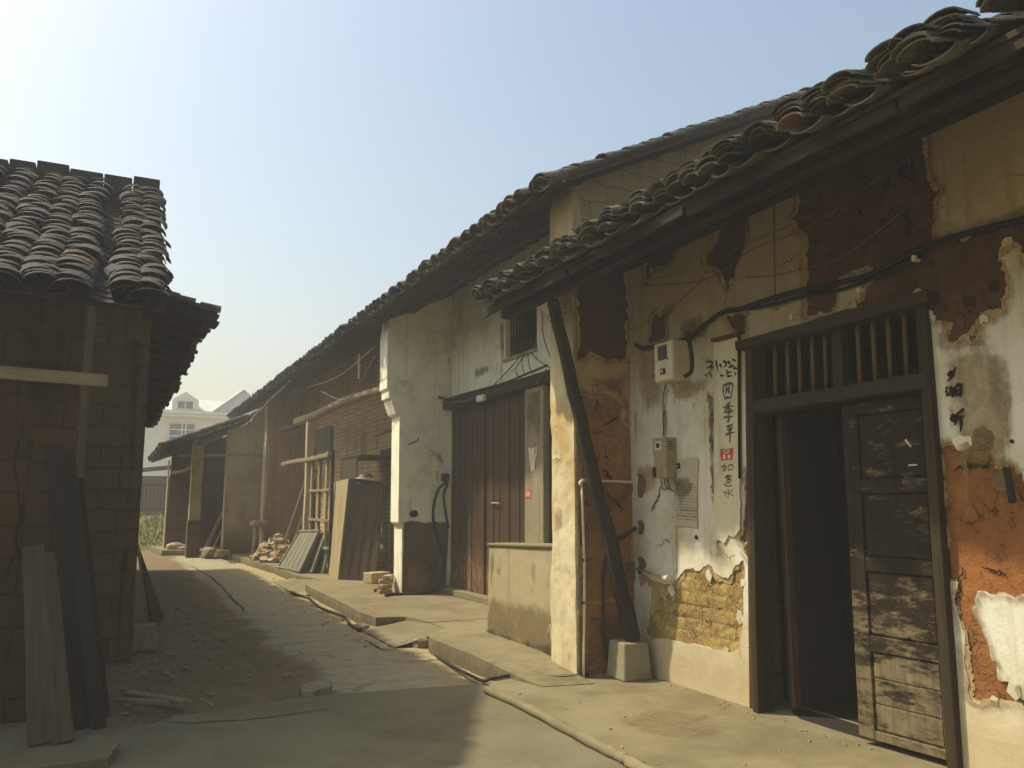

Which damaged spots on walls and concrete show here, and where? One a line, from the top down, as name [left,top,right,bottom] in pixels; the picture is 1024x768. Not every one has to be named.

spalling [929,237,1024,347]
crack [584,397,622,511]
leakage [950,354,1009,466]
spalling [941,435,1024,549]
spalling [577,447,607,677]
crack [955,565,1007,605]
spalling [951,579,1024,707]